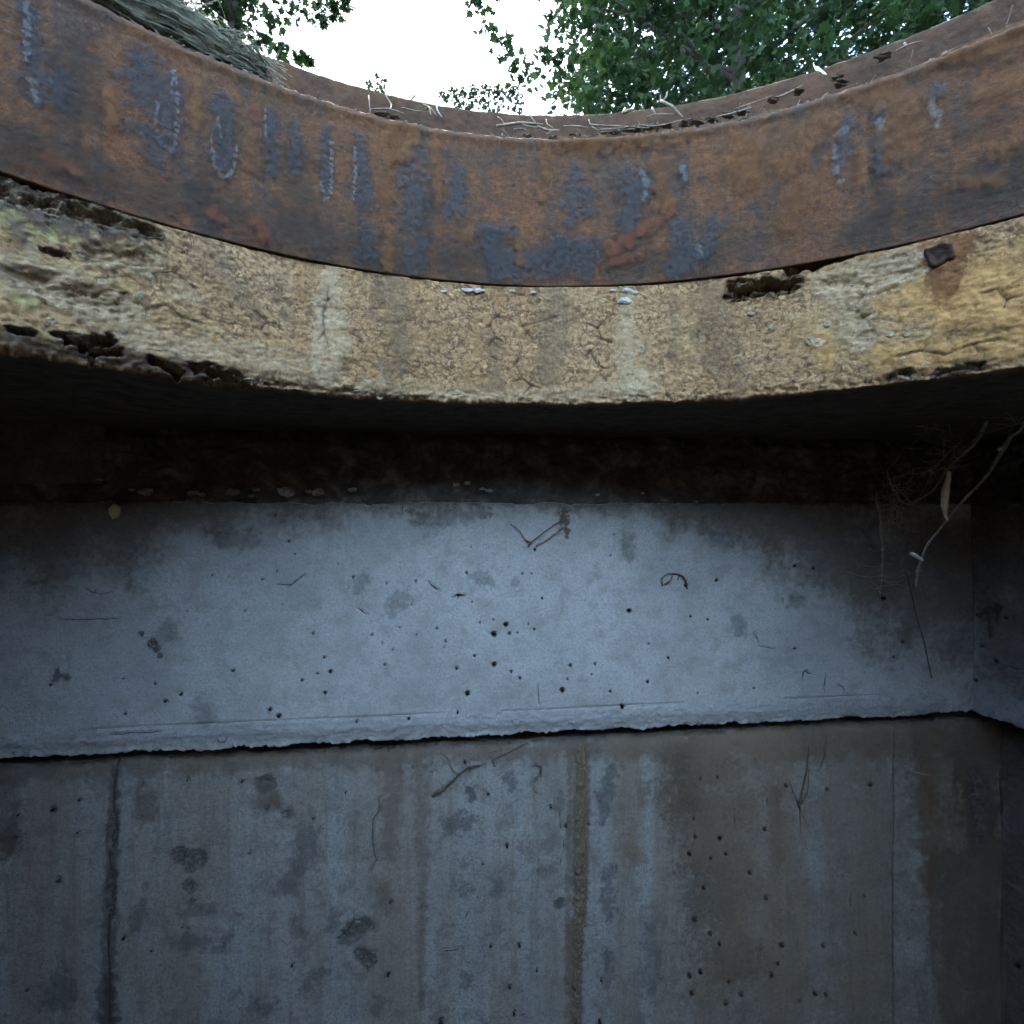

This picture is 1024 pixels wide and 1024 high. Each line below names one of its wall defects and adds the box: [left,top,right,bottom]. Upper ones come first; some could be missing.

corrosion [559,128,690,164]
peeling [0,176,429,400]
crack [483,303,556,394]
crack [586,317,610,368]
peeling [722,248,929,351]
corrosion [862,231,1024,371]
crack [105,731,159,877]
crack [105,904,113,1024]